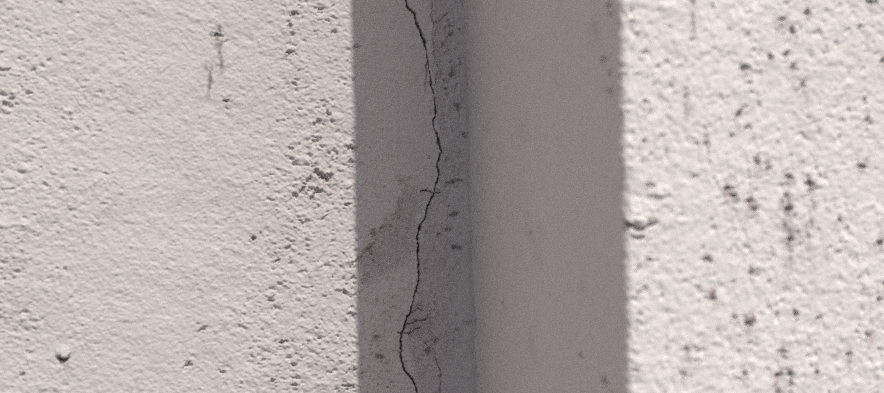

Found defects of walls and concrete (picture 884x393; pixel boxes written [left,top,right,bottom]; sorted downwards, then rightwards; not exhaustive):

crack [399,0,442,393]